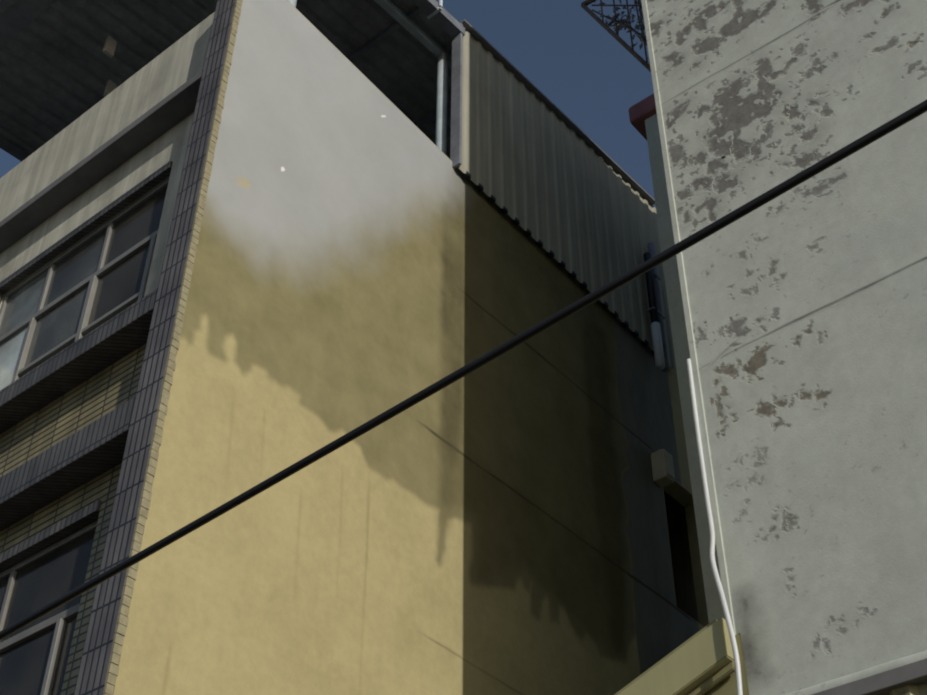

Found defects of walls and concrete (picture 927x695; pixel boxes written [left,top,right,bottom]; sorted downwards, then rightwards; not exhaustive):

peeling [653,0,927,242]
leakage [179,0,637,695]
flaking render [612,316,700,676]
peeling [692,231,834,544]
peeling [807,600,878,664]